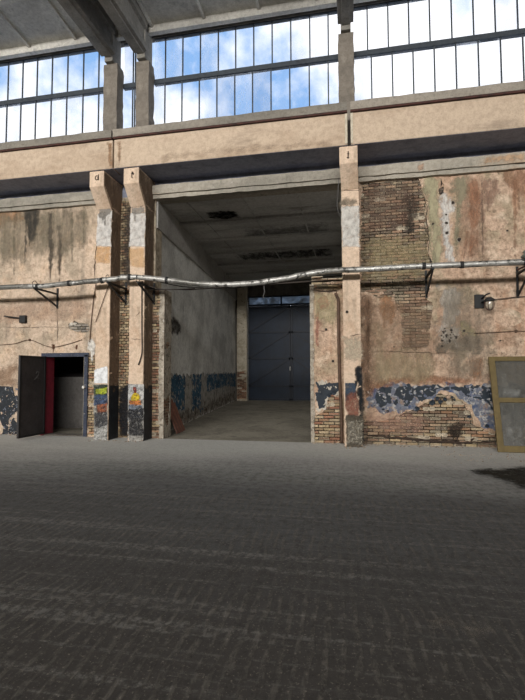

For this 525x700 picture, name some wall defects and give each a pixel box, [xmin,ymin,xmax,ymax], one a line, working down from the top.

leakage [0,210,87,282]
flaking render [360,179,434,351]
peeling [0,383,18,435]
peeling [158,290,247,439]
flaking render [310,276,343,443]
flaking render [362,381,525,447]